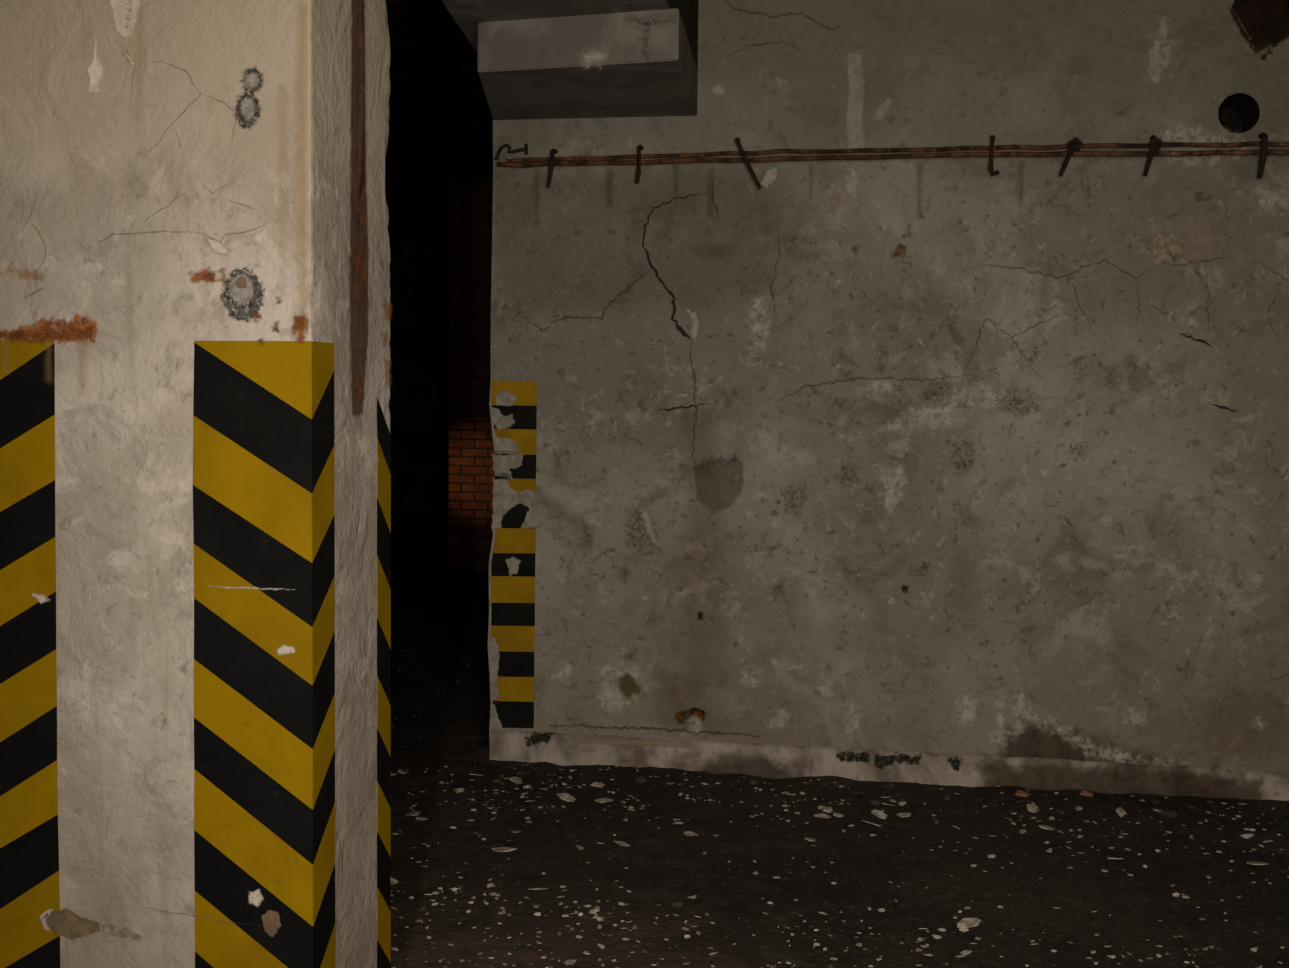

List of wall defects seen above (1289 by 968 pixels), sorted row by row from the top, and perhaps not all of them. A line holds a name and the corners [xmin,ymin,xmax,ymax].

peeling [109,0,140,68]
spalling [1230,0,1289,60]
peeling [87,36,103,93]
corrosion [350,0,391,415]
corrosion [192,268,225,283]
crack [642,194,697,340]
corrosion [0,315,97,343]
leakage [982,678,1261,800]
flaking render [40,908,142,940]